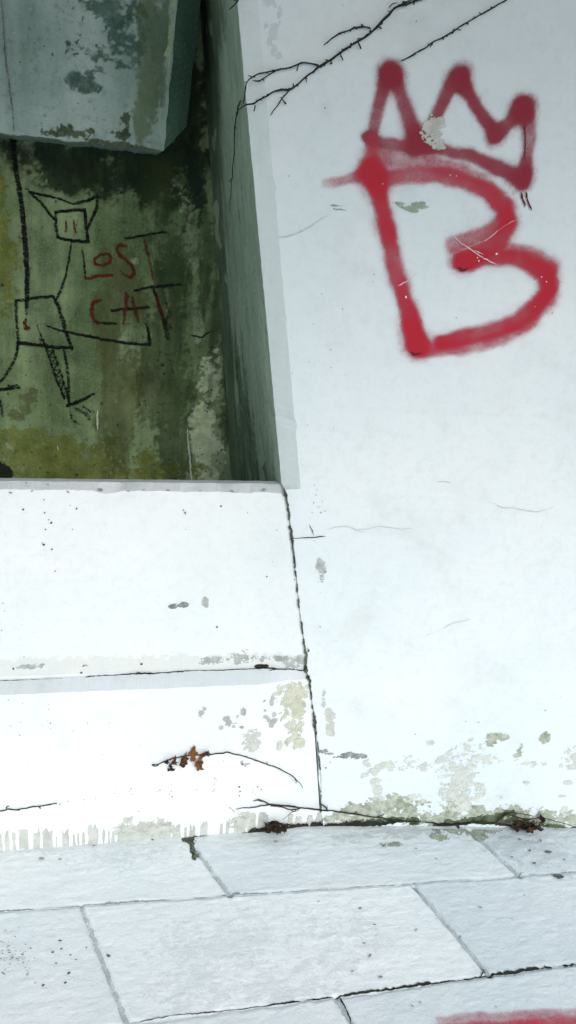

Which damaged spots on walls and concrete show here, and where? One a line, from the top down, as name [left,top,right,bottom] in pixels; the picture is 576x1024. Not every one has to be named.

damp [65,0,148,94]
peeling [419,113,447,150]
damp [161,184,201,274]
damp [187,296,227,480]
peeling [219,681,309,767]
peeling [288,733,576,864]